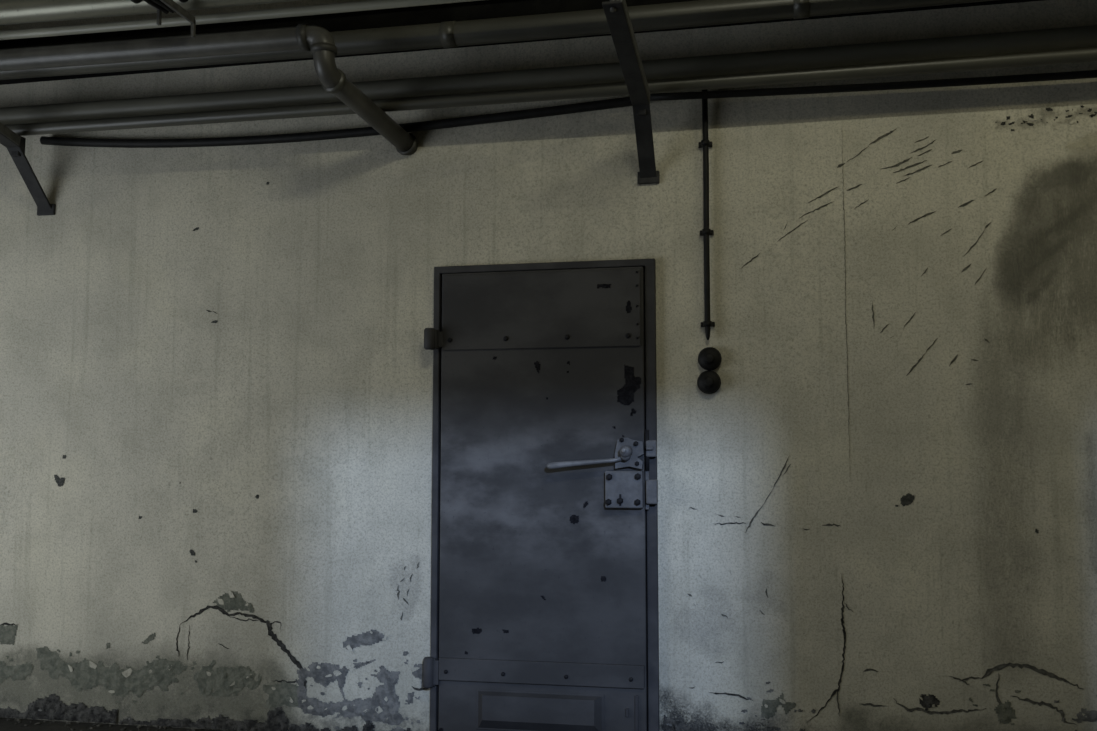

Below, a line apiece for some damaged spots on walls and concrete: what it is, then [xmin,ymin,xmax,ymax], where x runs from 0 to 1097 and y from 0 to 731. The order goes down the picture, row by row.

peeling [0,623,429,731]
crack [176,605,307,688]
crack [810,580,1082,725]
flaking render [660,682,816,731]
flaking render [918,694,940,710]
peeling [983,684,1021,725]
peeling [1054,700,1097,731]